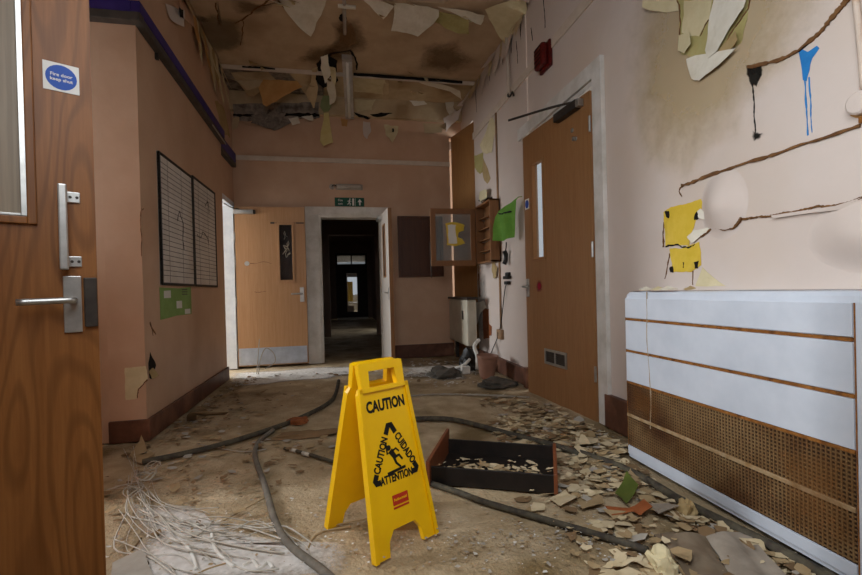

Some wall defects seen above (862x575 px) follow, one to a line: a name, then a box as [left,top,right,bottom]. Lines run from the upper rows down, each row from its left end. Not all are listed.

spalling [316,57,338,88]
peeling [642,0,751,80]
crack [746,0,850,69]
spalling [232,102,319,131]
spalling [354,99,392,120]
crack [679,124,861,197]
crack [742,196,862,220]
peeling [651,199,725,290]